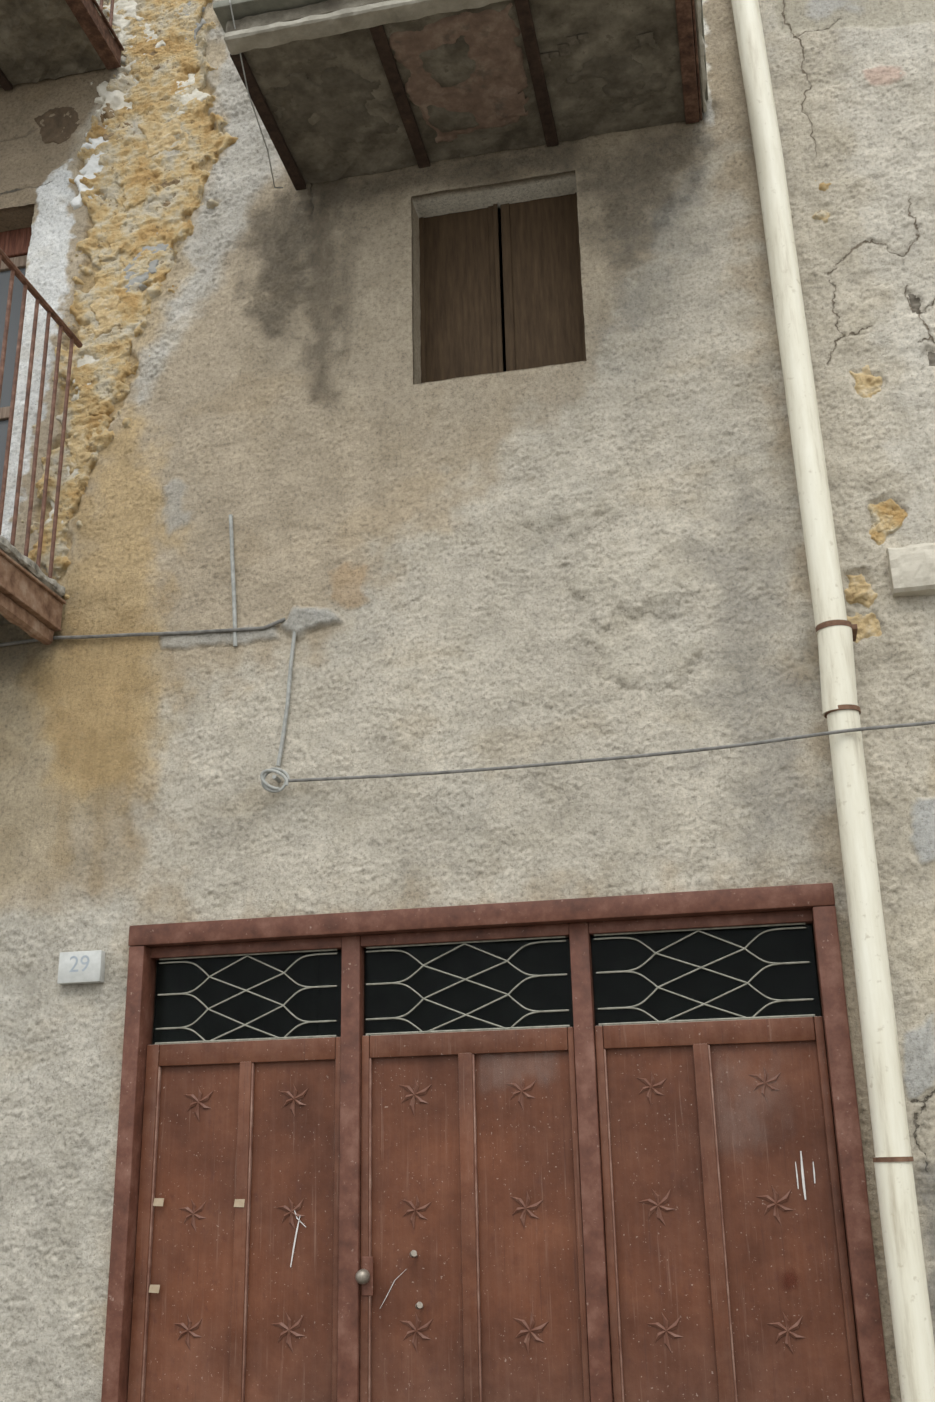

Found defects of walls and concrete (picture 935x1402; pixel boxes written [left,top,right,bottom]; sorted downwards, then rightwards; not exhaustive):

crack [782,0,842,158]
flaking render [21,0,238,600]
crack [826,199,935,365]
spalling [849,365,883,398]
spalling [867,499,908,545]
spalling [844,574,882,643]